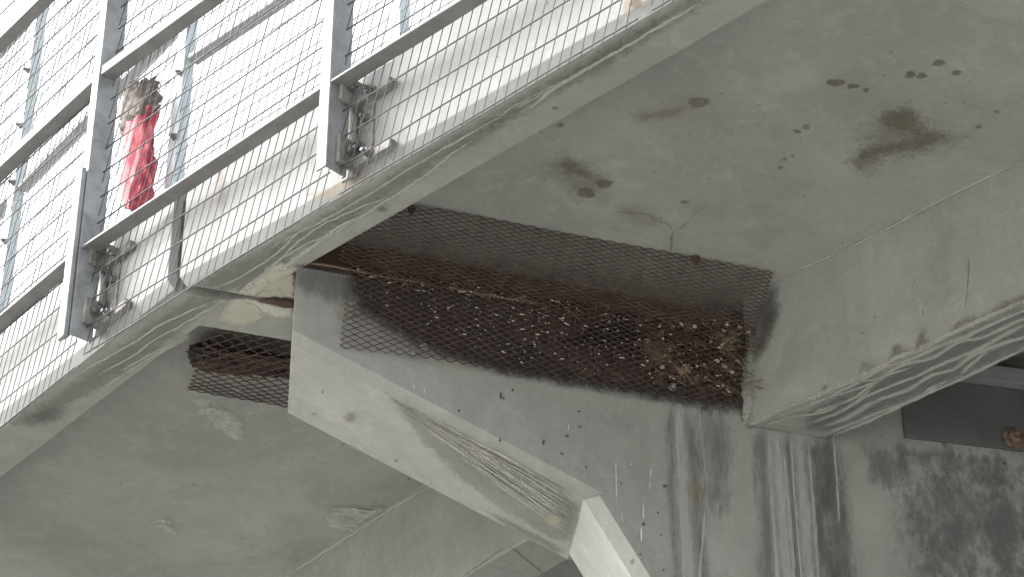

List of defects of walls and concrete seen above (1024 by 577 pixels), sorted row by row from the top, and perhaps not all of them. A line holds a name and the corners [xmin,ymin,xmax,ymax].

leakage [827,80,867,92]
leakage [37,3,700,423]
leakage [396,401,566,527]
leakage [675,407,705,577]
leakage [761,297,1024,577]